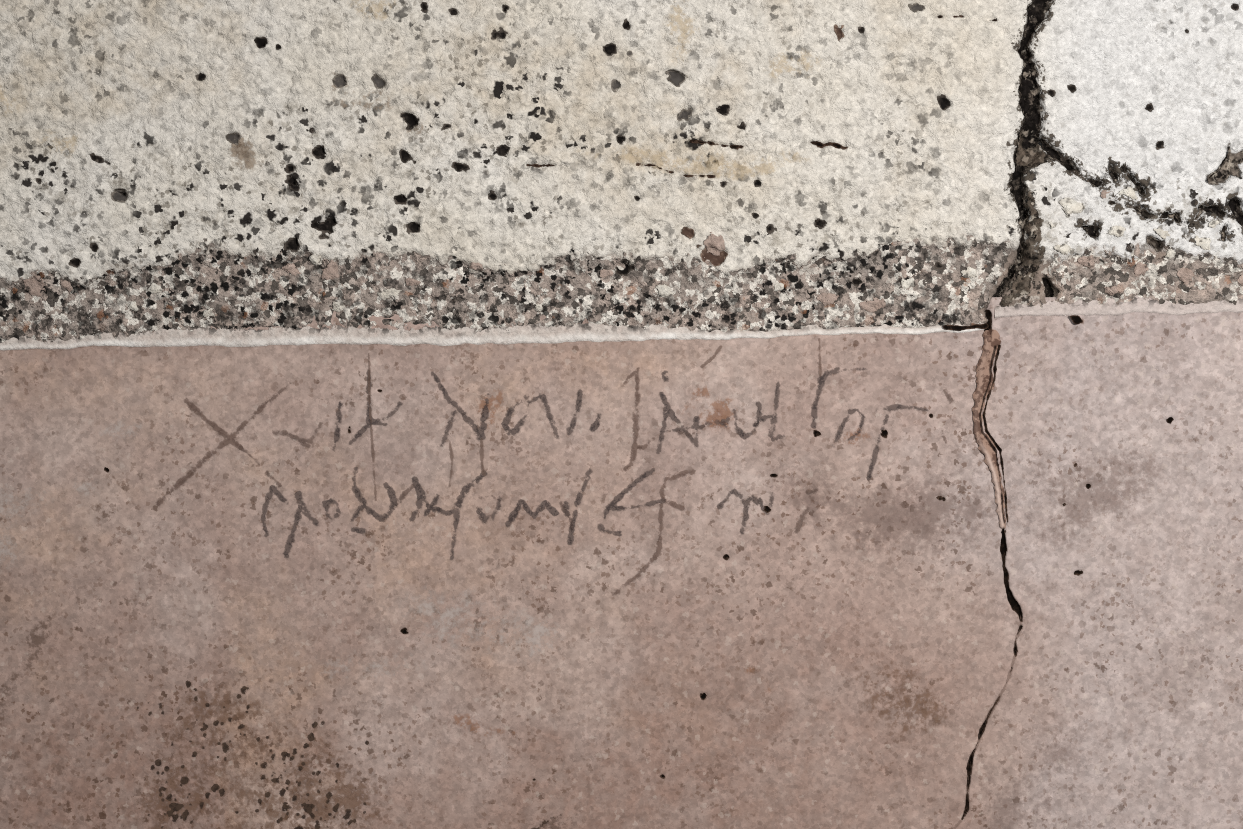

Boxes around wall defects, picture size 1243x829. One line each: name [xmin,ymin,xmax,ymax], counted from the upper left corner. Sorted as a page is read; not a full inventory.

crack [938,0,1243,820]